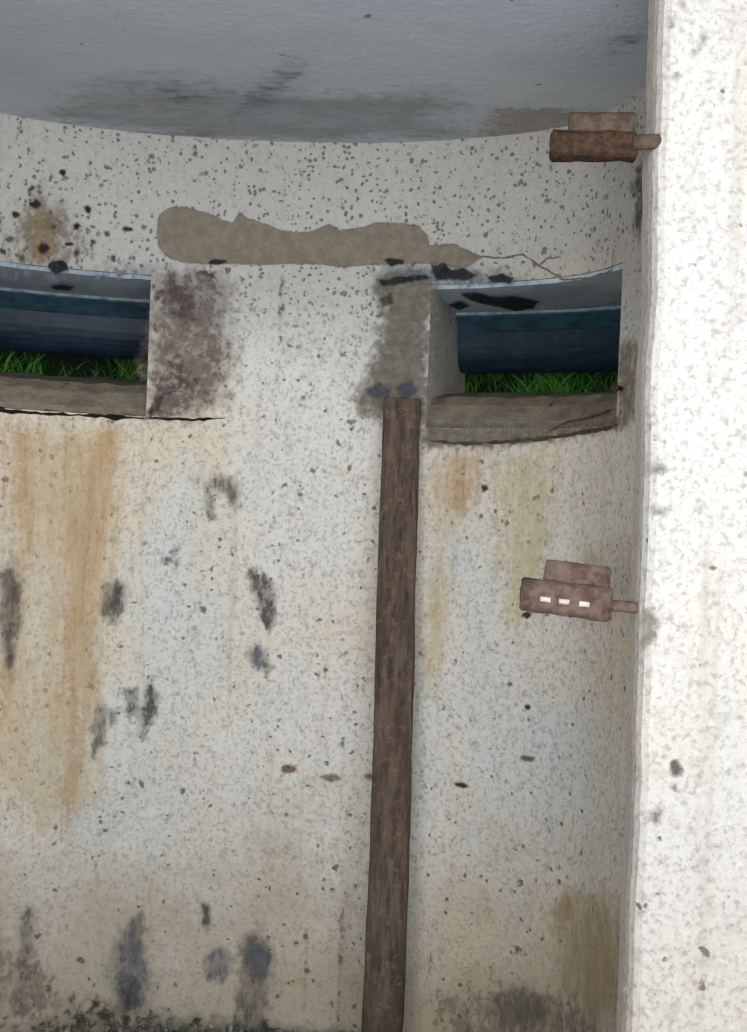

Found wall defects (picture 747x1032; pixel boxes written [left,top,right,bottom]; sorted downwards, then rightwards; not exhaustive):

leakage [631,167,643,230]
spalling [137,207,538,421]
peeling [618,342,638,425]
leakage [206,478,236,518]
leakage [0,568,22,667]
leakage [102,581,123,621]
leakage [248,569,276,629]
leakage [252,646,268,671]
leakage [92,708,113,755]
leakage [125,684,157,726]
leakage [202,905,211,925]
leakage [31,920,272,1032]